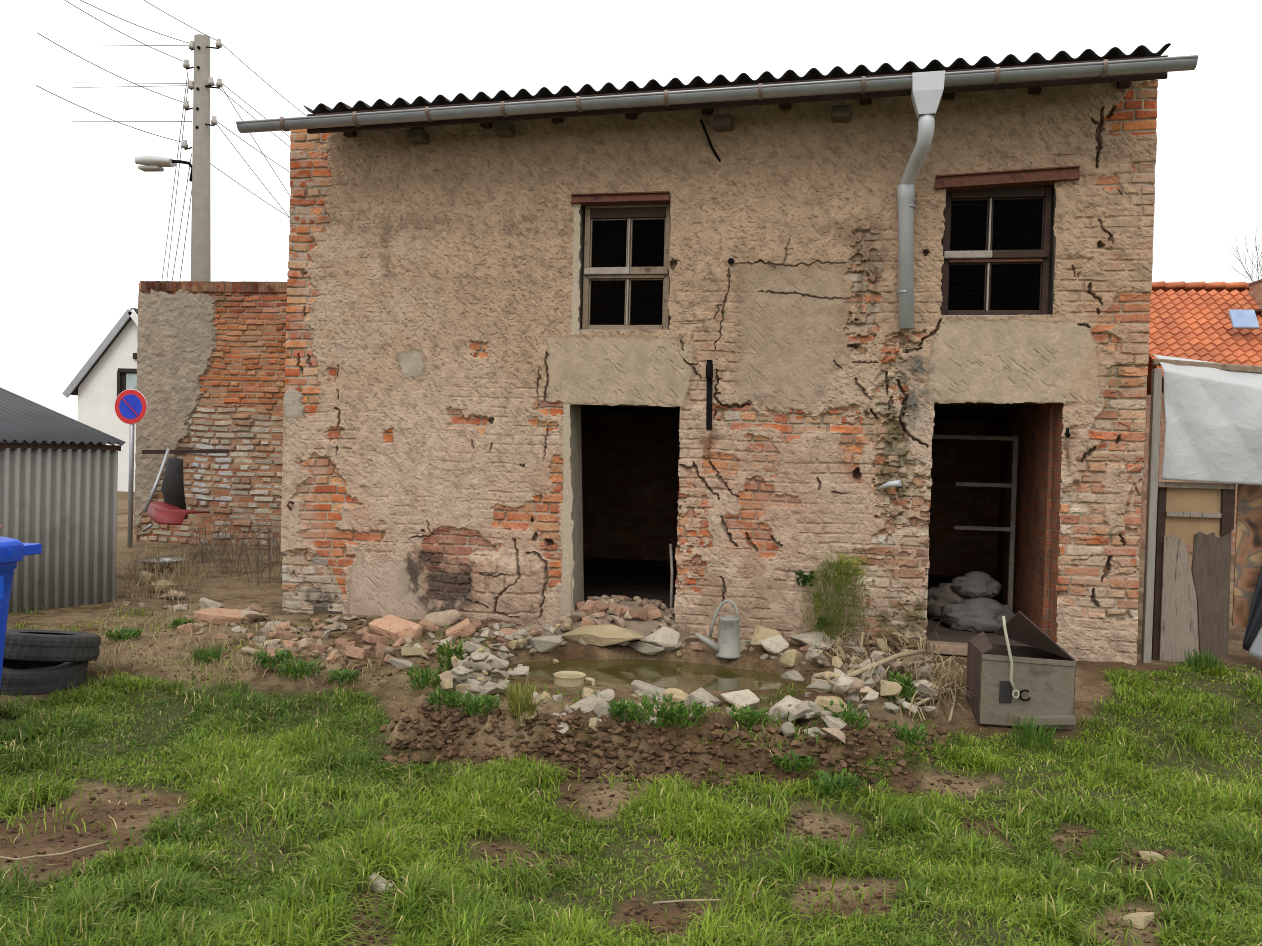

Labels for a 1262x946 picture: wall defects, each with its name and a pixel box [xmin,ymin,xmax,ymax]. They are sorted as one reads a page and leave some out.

spalling [1096,163,1156,191]
spalling [1102,80,1158,137]
spalling [166,129,338,418]
spalling [281,427,386,613]
spalling [447,407,494,435]
spalling [420,454,567,606]
crack [469,538,548,619]
crack [680,248,846,419]
spalling [675,228,932,652]
crack [833,319,942,447]
spalling [1056,289,1151,625]